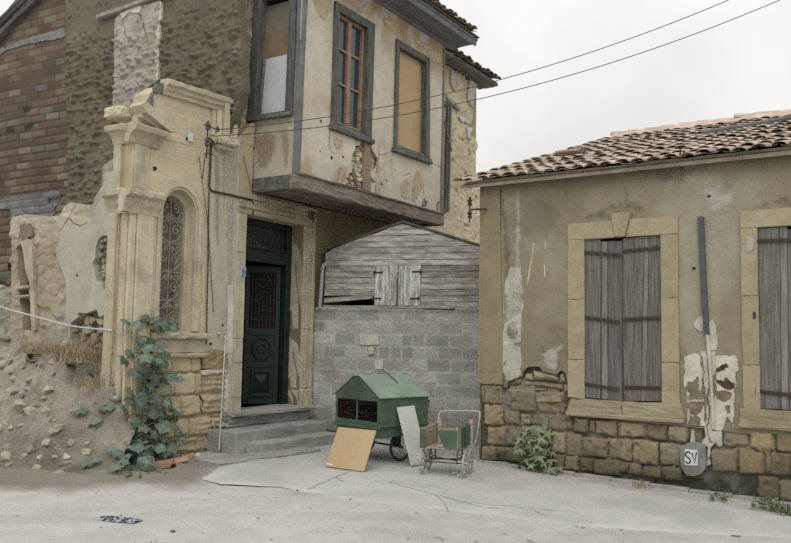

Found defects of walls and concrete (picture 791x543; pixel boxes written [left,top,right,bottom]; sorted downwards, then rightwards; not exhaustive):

peeling [111,1,164,107]
spalling [331,139,387,193]
peeling [502,267,568,402]
peeling [683,316,739,466]